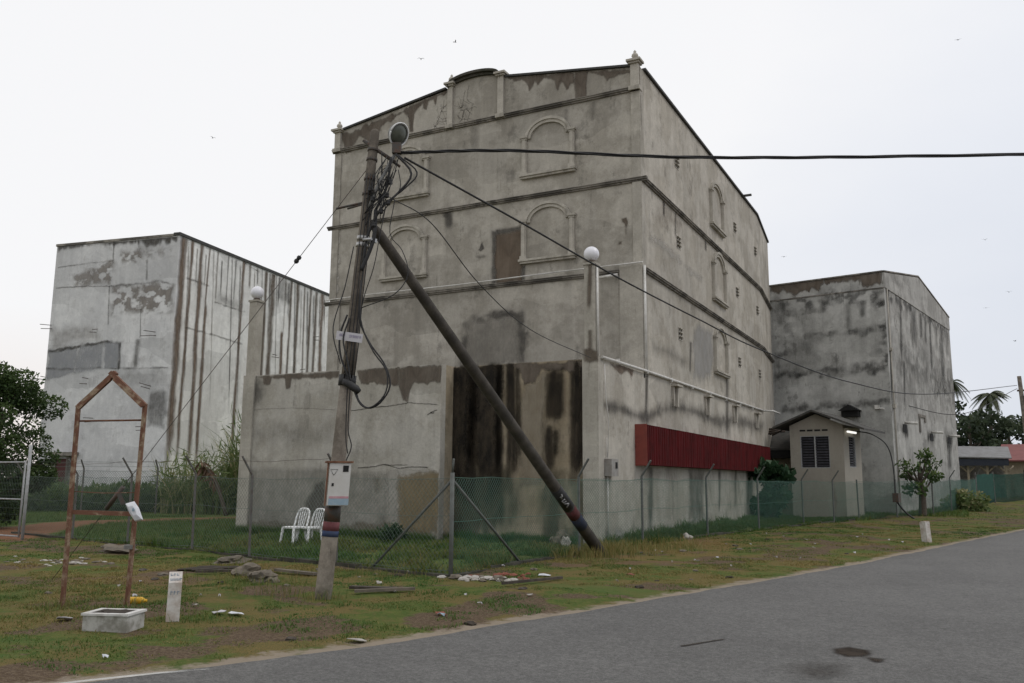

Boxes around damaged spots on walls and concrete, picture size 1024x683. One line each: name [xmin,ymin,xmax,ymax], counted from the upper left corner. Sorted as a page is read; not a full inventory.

leakage [509,69,630,98]
peeling [75,251,173,312]
leakage [770,272,911,316]
leakage [255,371,339,399]
leakage [856,322,905,405]
leakage [358,331,598,537]